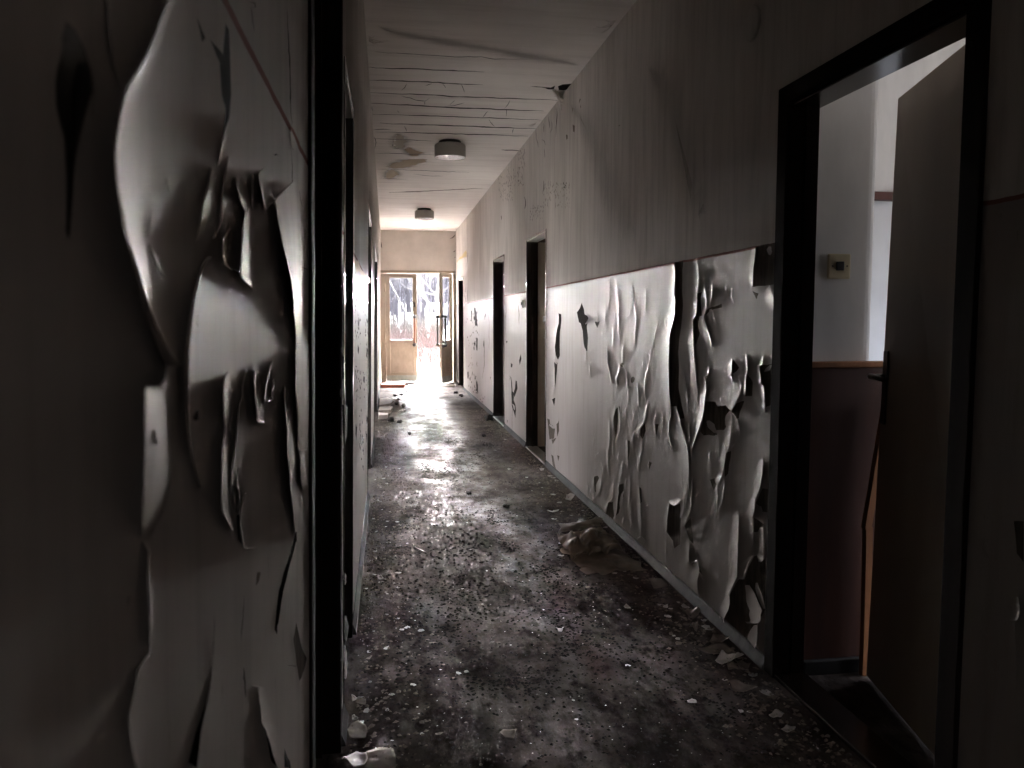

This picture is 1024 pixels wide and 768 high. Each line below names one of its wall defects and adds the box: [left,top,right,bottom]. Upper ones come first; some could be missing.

peeling [746,243,775,312]
peeling [106,0,309,768]
peeling [340,258,371,470]
peeling [467,308,491,403]
peeling [510,355,521,417]
peeling [551,313,561,404]
peeling [539,419,559,471]
peeling [575,261,772,648]